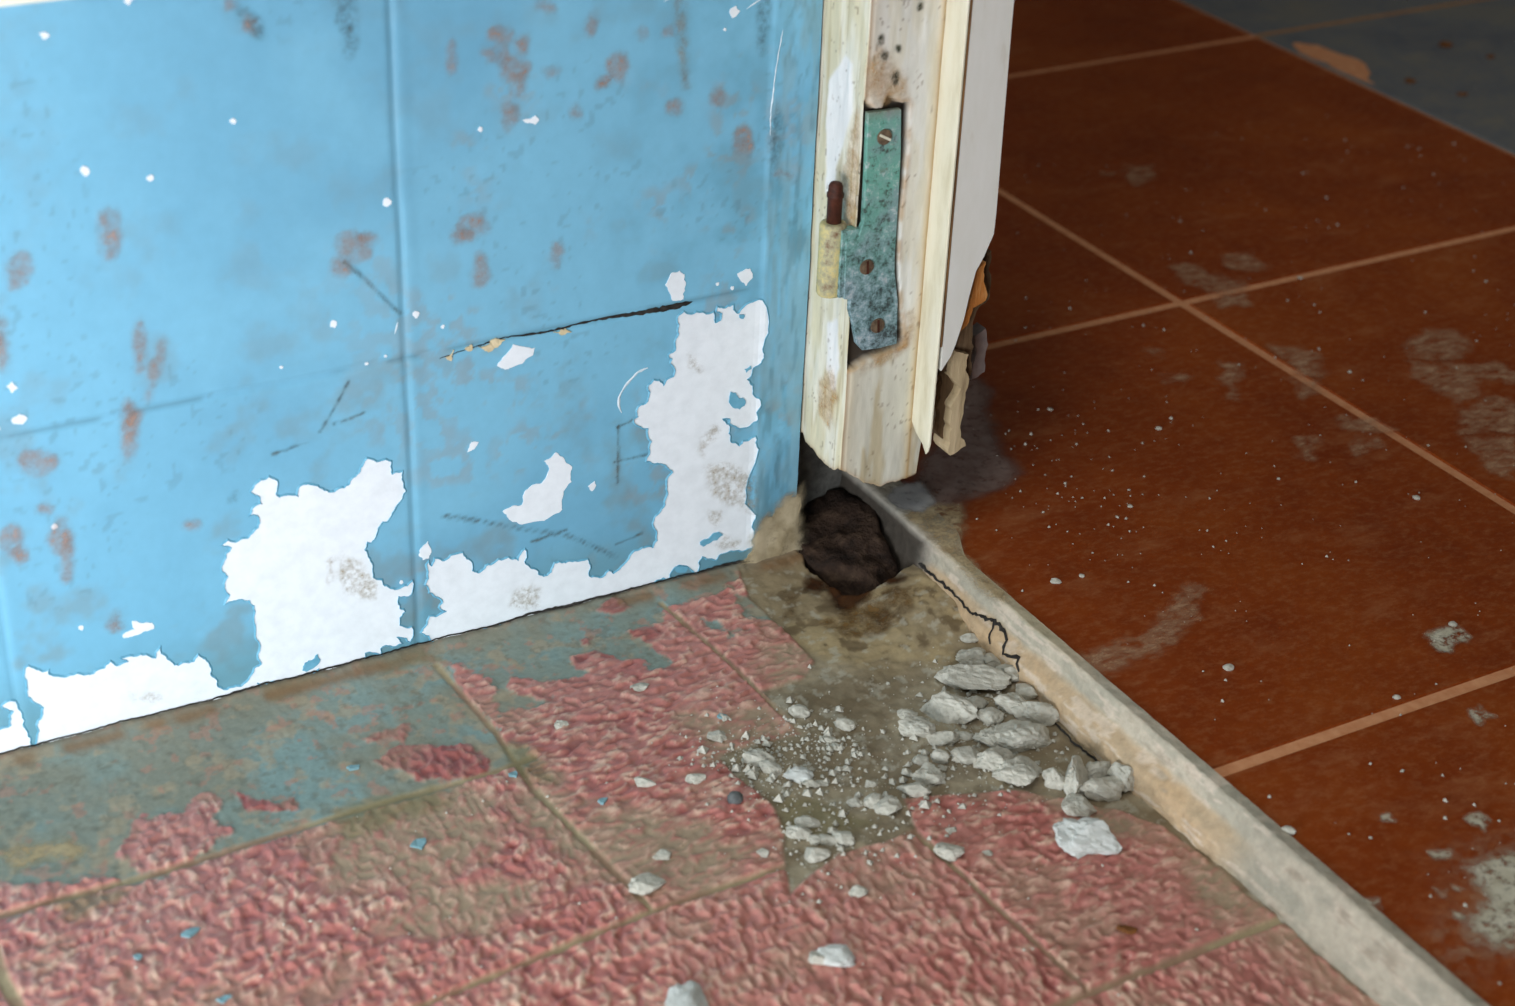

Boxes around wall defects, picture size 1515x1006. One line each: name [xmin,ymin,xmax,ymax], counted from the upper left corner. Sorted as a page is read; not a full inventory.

crack [439,301,692,361]
water stain [1415,363,1515,475]
peeling [0,269,802,753]
crack [918,563,1020,672]
crack [1055,722,1099,762]